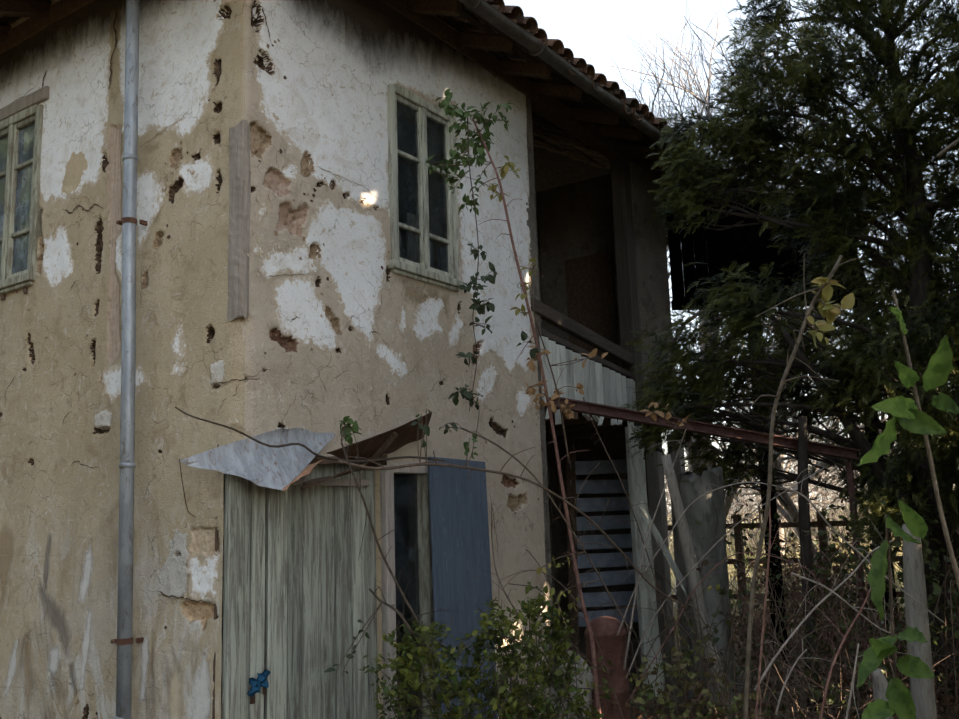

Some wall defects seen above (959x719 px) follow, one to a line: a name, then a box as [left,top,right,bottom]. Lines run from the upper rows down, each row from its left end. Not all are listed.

peeling [0,12,126,221]
peeling [136,0,236,251]
peeling [36,219,78,288]
crack [63,204,102,218]
spalling [94,216,122,281]
peeling [247,0,534,438]
spalling [22,310,39,371]
peeling [86,334,121,434]
peeling [169,318,187,377]
flaking render [210,360,225,389]
crack [213,351,258,409]
crack [157,590,214,606]